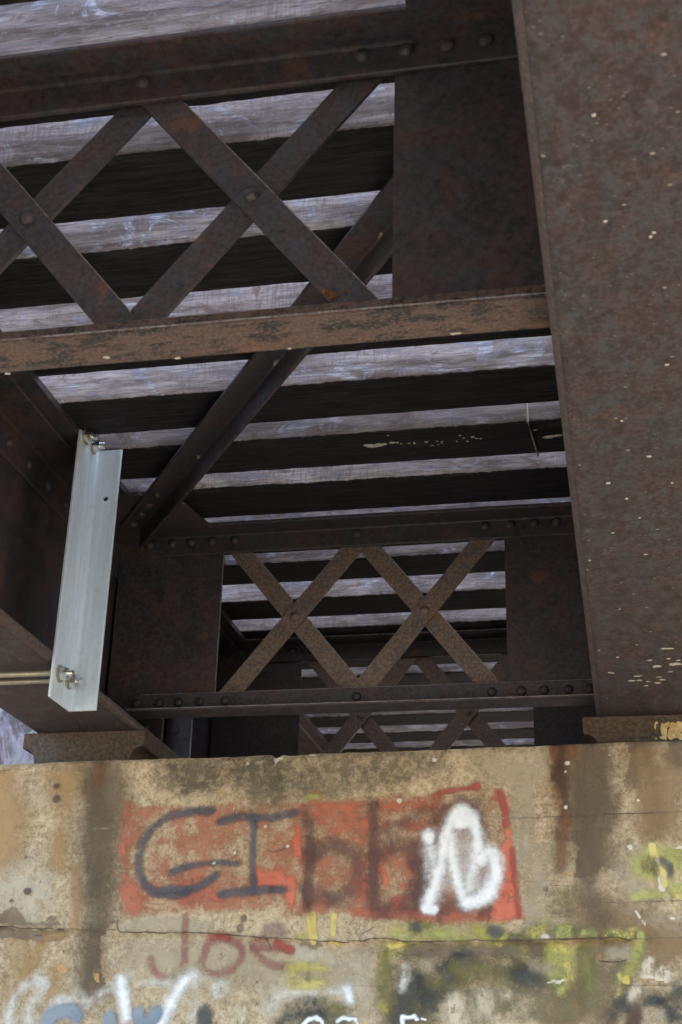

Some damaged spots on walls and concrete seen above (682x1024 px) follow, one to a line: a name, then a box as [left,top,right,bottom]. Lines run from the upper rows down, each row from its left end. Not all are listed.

water stain [0,772,48,912]
water stain [38,765,126,998]
crack [0,916,657,985]
water stain [444,742,682,1024]
corrosion [551,745,576,878]